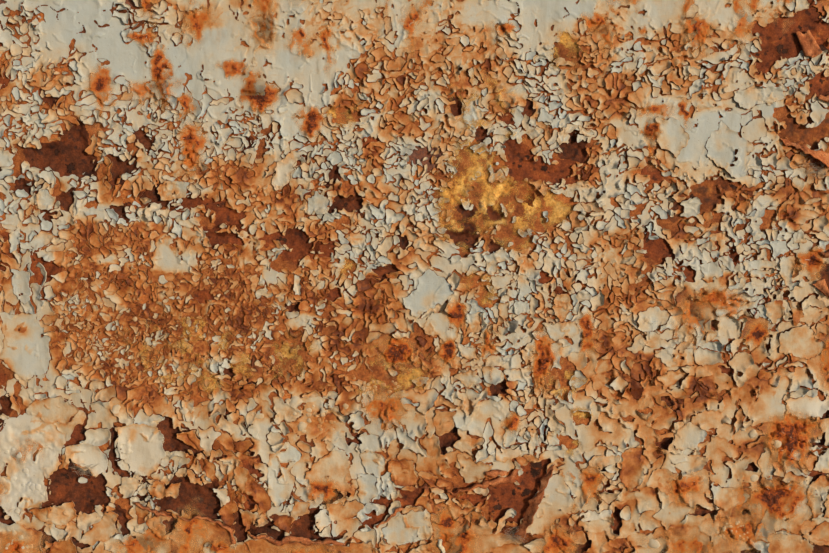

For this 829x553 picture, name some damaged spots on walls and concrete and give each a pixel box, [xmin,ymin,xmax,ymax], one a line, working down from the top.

peeling [109,0,184,56]
rust [472,96,589,187]
peeling [655,117,690,158]
rust [730,0,829,153]
peeling [787,93,829,128]
rust [138,161,364,268]
rust [442,203,505,254]
rust [39,414,351,553]
rust [433,455,558,553]
peeling [711,474,829,553]
peeling [793,445,829,475]
peeling [809,427,829,446]